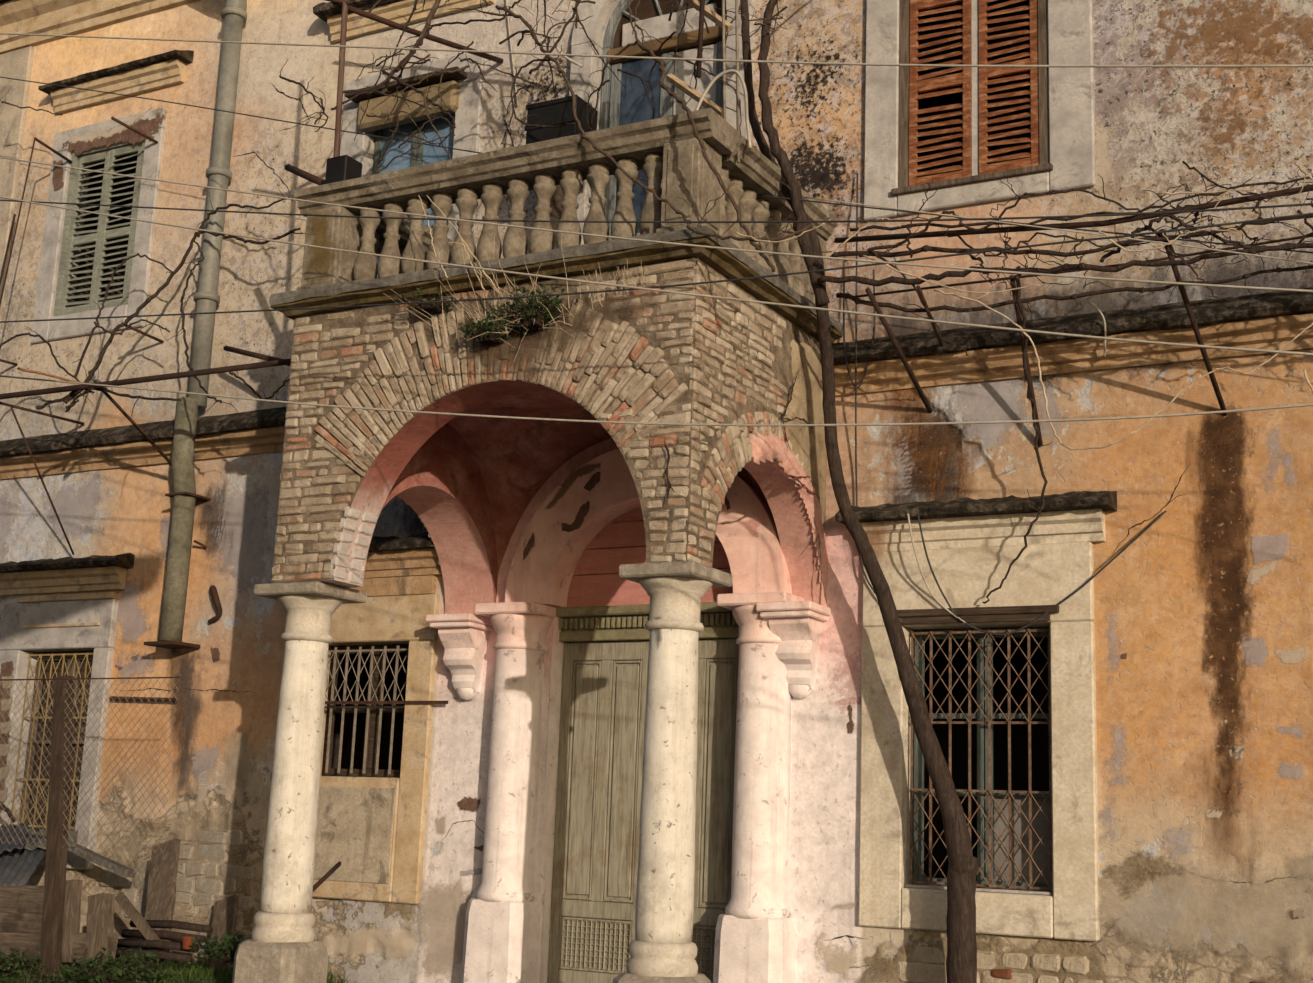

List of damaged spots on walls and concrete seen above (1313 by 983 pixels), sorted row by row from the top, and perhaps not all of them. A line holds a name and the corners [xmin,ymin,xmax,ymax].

peeling [1140,0,1313,159]
water stain [893,409,965,504]
flaking render [547,463,600,532]
flaking render [523,533,535,560]
peeling [1248,534,1290,584]
water stain [1198,408,1253,845]
flaking render [1242,637,1307,666]
water stain [172,649,200,787]
flaking render [457,796,481,812]
crack [1177,870,1313,888]